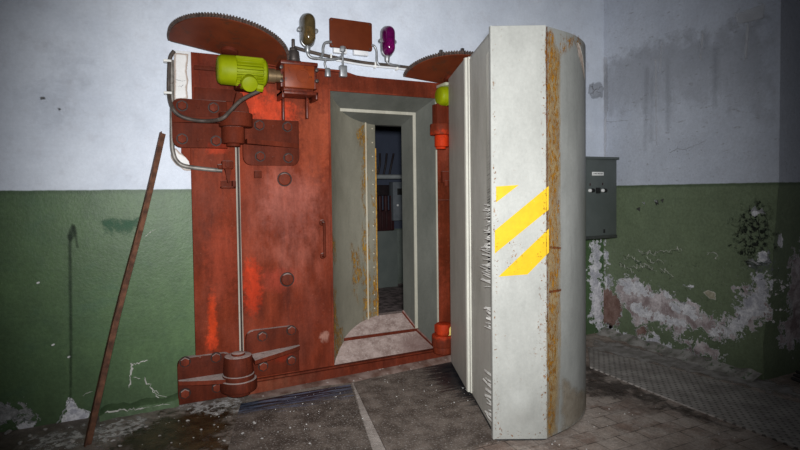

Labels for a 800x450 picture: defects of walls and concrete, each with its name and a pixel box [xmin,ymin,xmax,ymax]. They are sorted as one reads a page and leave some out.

rust [351,220,379,318]
rust [545,27,580,435]
peeling [586,234,800,360]
leakage [728,201,776,263]
peeling [0,402,40,430]
peeling [57,397,91,423]